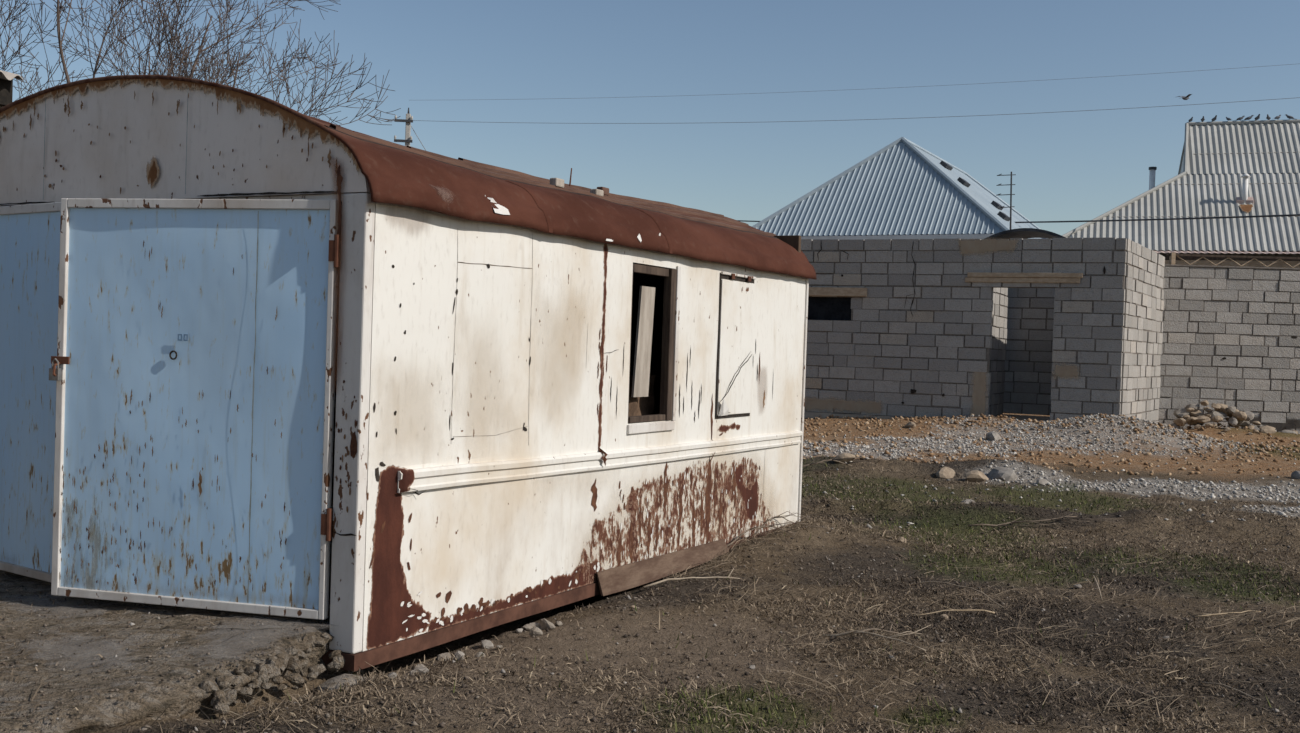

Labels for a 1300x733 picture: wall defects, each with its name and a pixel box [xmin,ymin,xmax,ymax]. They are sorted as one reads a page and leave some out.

corrosion [0,79,360,367]
corrosion [597,243,608,466]
corrosion [59,436,172,593]
corrosion [367,465,497,650]
corrosion [579,394,775,585]